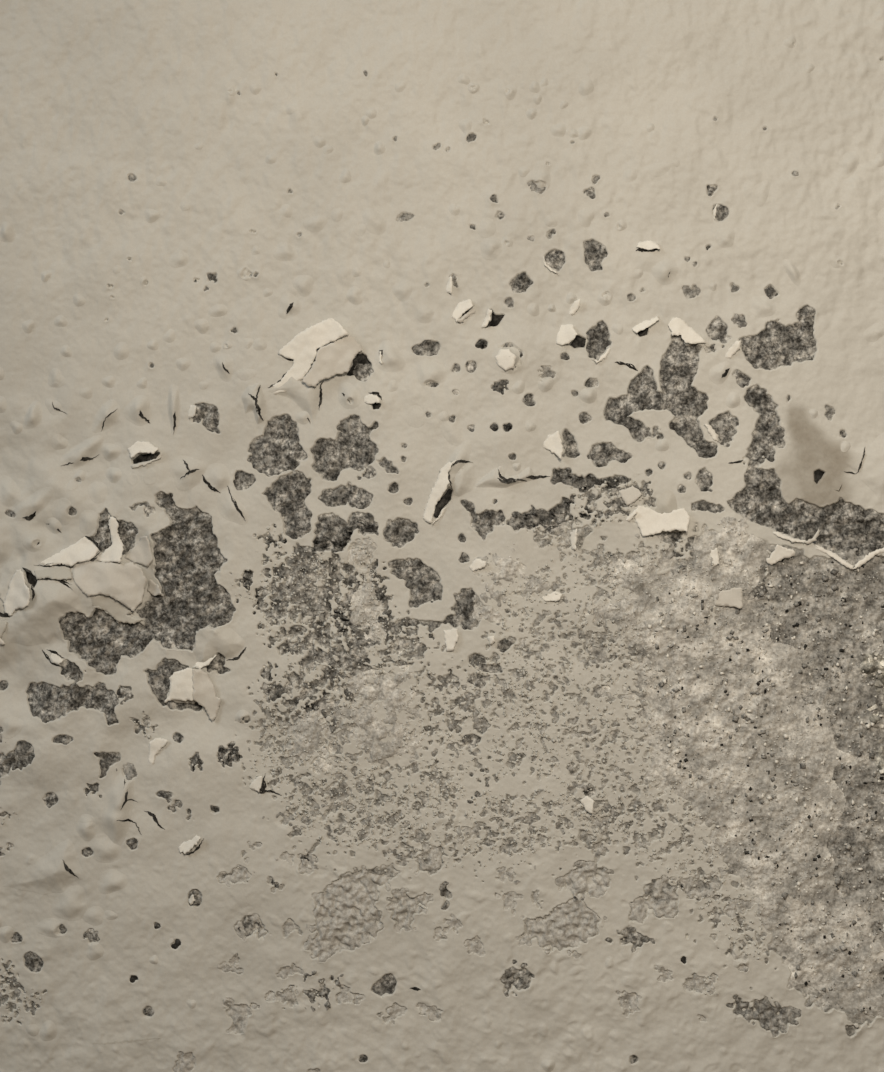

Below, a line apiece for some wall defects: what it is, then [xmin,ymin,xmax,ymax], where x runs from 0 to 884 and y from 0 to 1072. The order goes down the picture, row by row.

peeling [446,272,533,349]